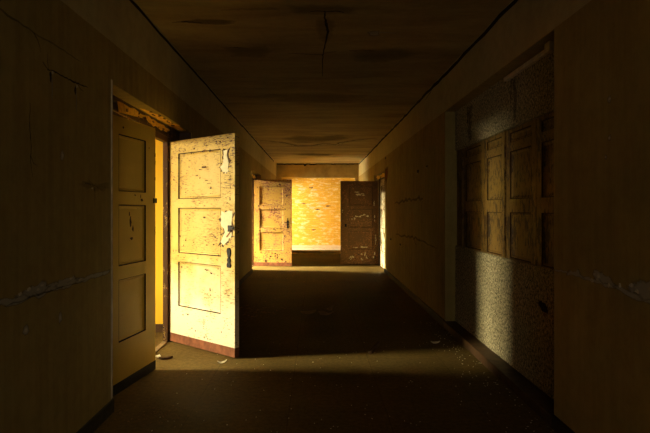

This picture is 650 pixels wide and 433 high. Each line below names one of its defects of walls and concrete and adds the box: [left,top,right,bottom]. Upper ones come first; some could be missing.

crack [129,0,518,166]
peeling [117,101,186,138]
peeling [219,137,231,176]
peeling [206,211,236,247]